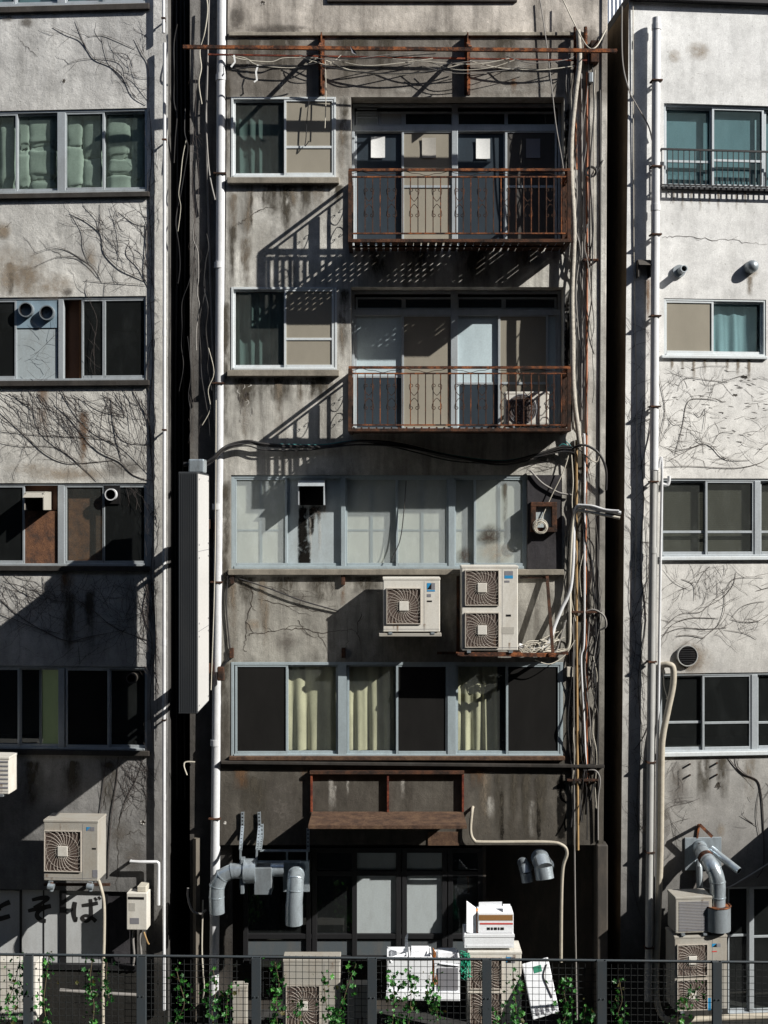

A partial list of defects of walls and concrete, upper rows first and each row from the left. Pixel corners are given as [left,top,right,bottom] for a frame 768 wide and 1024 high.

damp [230,185,343,273]
damp [482,774,566,839]
damp [698,758,726,791]